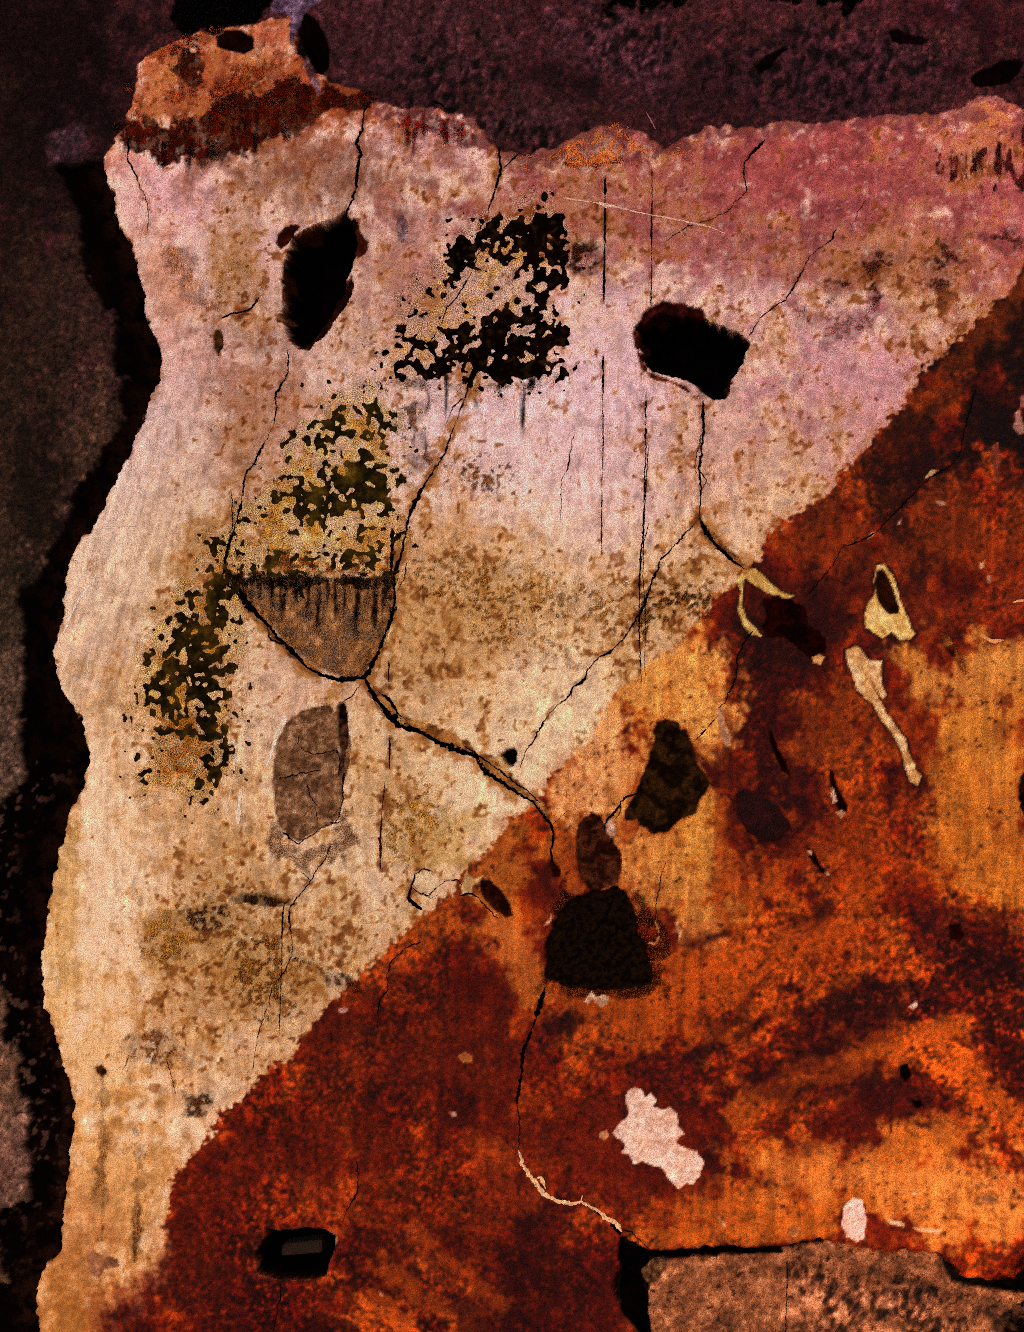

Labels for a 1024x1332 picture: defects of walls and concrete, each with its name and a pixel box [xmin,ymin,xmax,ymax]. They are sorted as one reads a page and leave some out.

corrosion [117,29,373,168]
corrosion [564,125,655,167]
peeling [122,192,586,845]
leakage [229,572,396,677]
crack [222,350,744,869]
corrosion [156,714,214,773]
crack [407,868,500,919]
spalling [544,720,711,1008]
crack [377,942,421,1034]
crack [515,987,649,1261]
peeling [600,1088,705,1190]
peeling [842,1198,869,1244]